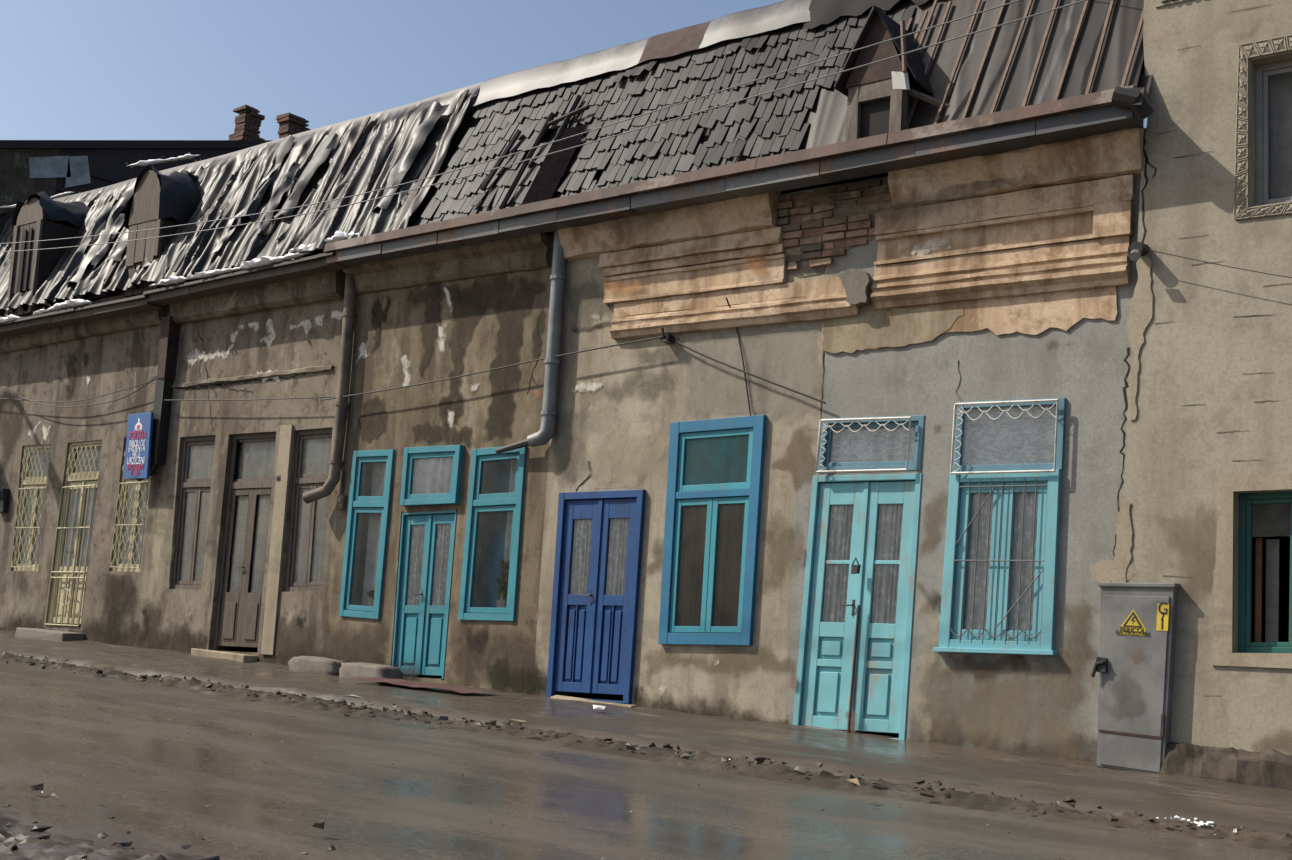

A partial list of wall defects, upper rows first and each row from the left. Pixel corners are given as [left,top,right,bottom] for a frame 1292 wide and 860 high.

spalling [776,177,892,277]
peeling [187,319,276,366]
peeling [291,310,342,334]
leakage [410,277,545,446]
leakage [568,282,615,327]
leakage [573,351,674,398]
spalling [823,304,964,354]
crack [1234,283,1292,317]
leakage [358,397,387,442]
crack [1181,372,1279,461]
crack [1113,347,1130,557]